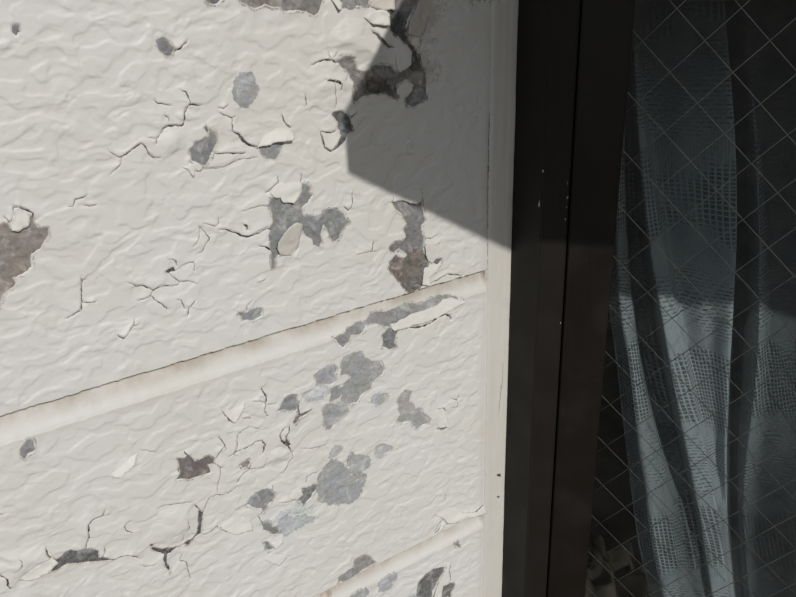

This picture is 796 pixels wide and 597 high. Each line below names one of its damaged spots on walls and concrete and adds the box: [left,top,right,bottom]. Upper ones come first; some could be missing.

peeling [313,0,432,106]
crack [110,90,199,175]
peeling [0,206,51,301]
crack [131,218,271,317]
peeling [248,175,350,268]
crack [119,320,138,339]
peeling [278,188,466,469]
peeling [19,510,124,581]
peeling [177,451,222,479]
crack [219,388,268,456]
peeling [237,444,391,566]
peeling [410,566,455,597]